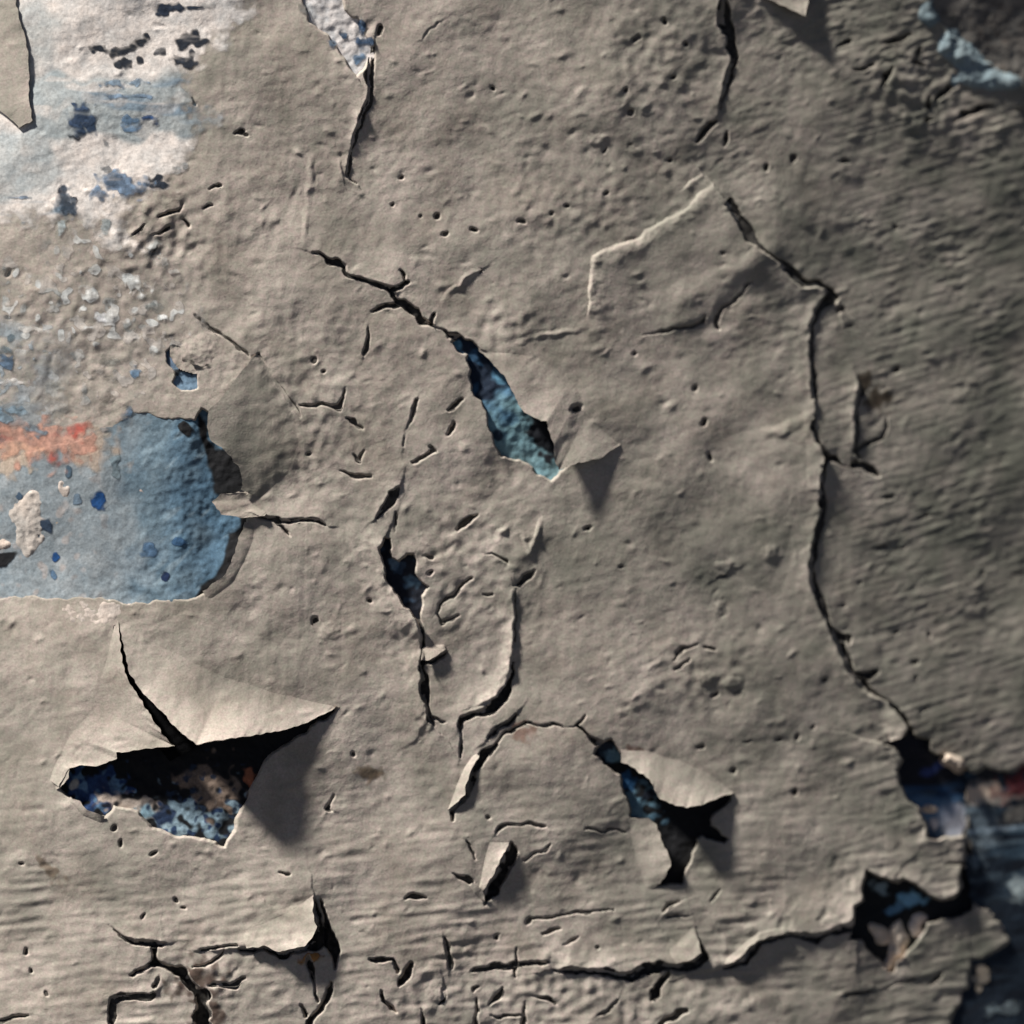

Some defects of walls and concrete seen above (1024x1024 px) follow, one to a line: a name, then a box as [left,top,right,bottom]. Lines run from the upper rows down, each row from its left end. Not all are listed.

crack [347,26,383,183]
peeling [918,0,1024,91]
peeling [0,0,311,604]
crack [314,251,458,354]
peeling [453,336,620,480]
crack [726,197,910,734]
peeling [50,621,338,846]
crack [450,619,597,820]
peeling [595,740,734,889]
peeling [850,707,1024,1024]
crack [105,900,340,1024]
crack [422,909,866,1024]